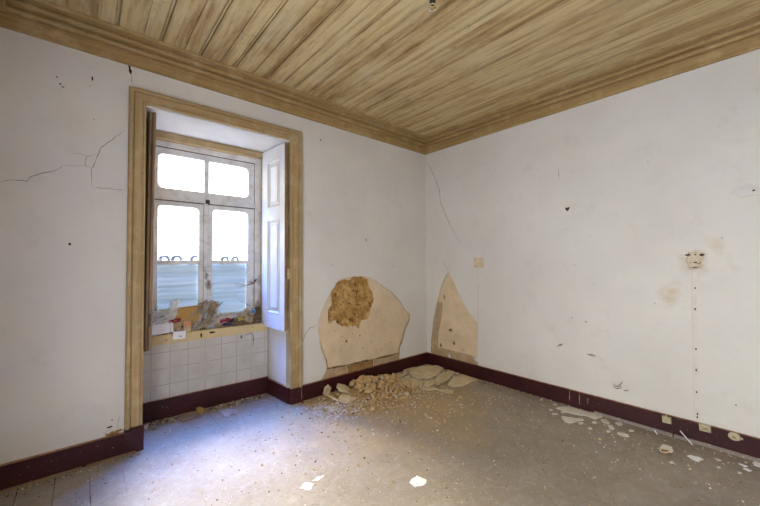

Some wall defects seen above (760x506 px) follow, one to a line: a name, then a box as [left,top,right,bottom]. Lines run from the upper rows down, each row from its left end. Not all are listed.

crack [2,131,123,190]
flaking render [318,276,409,380]
flaking render [431,273,478,365]